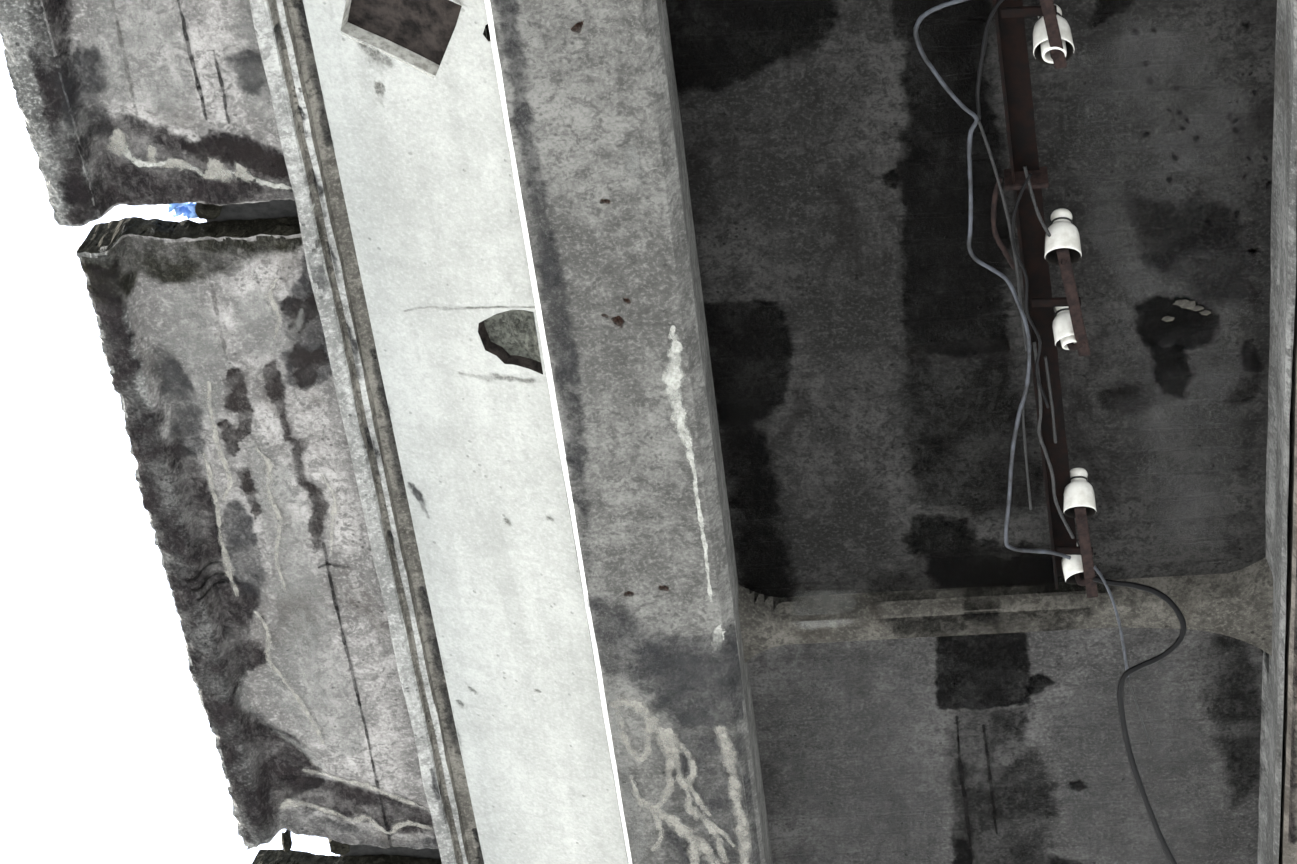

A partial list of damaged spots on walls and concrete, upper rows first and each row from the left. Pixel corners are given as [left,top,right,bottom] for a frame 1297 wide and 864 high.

crack [177,0,230,124]
leakage [82,240,439,850]
crack [318,542,392,845]
spalling [478,310,543,374]
leakage [589,599,760,864]
leakage [662,326,713,602]
leakage [704,301,794,611]
leakage [883,0,1107,864]